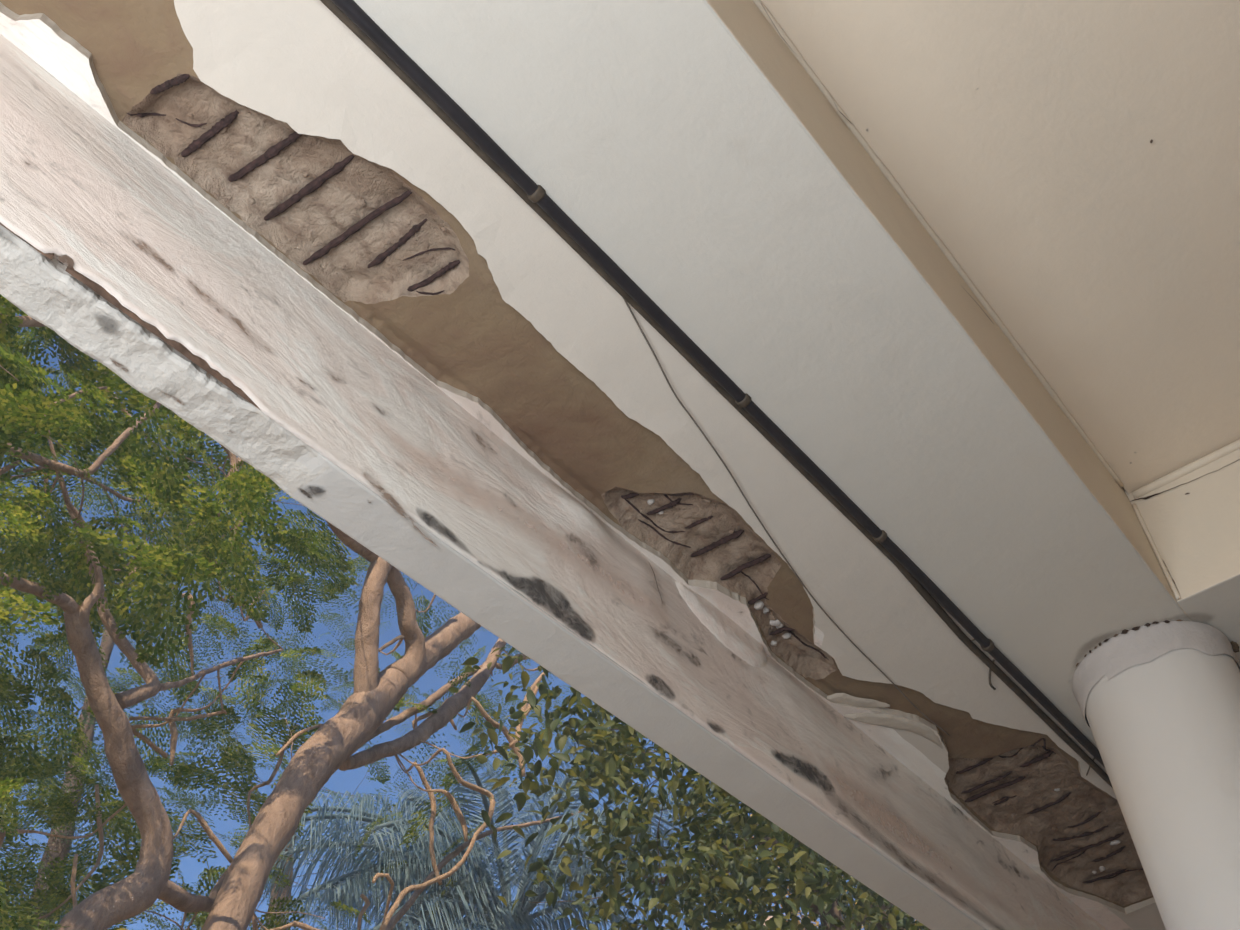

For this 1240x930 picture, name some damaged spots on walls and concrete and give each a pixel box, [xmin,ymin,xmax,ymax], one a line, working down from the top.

spalling [0,0,727,526]
water stain [498,571,593,641]
water stain [775,751,965,903]
spalling [601,486,1154,908]